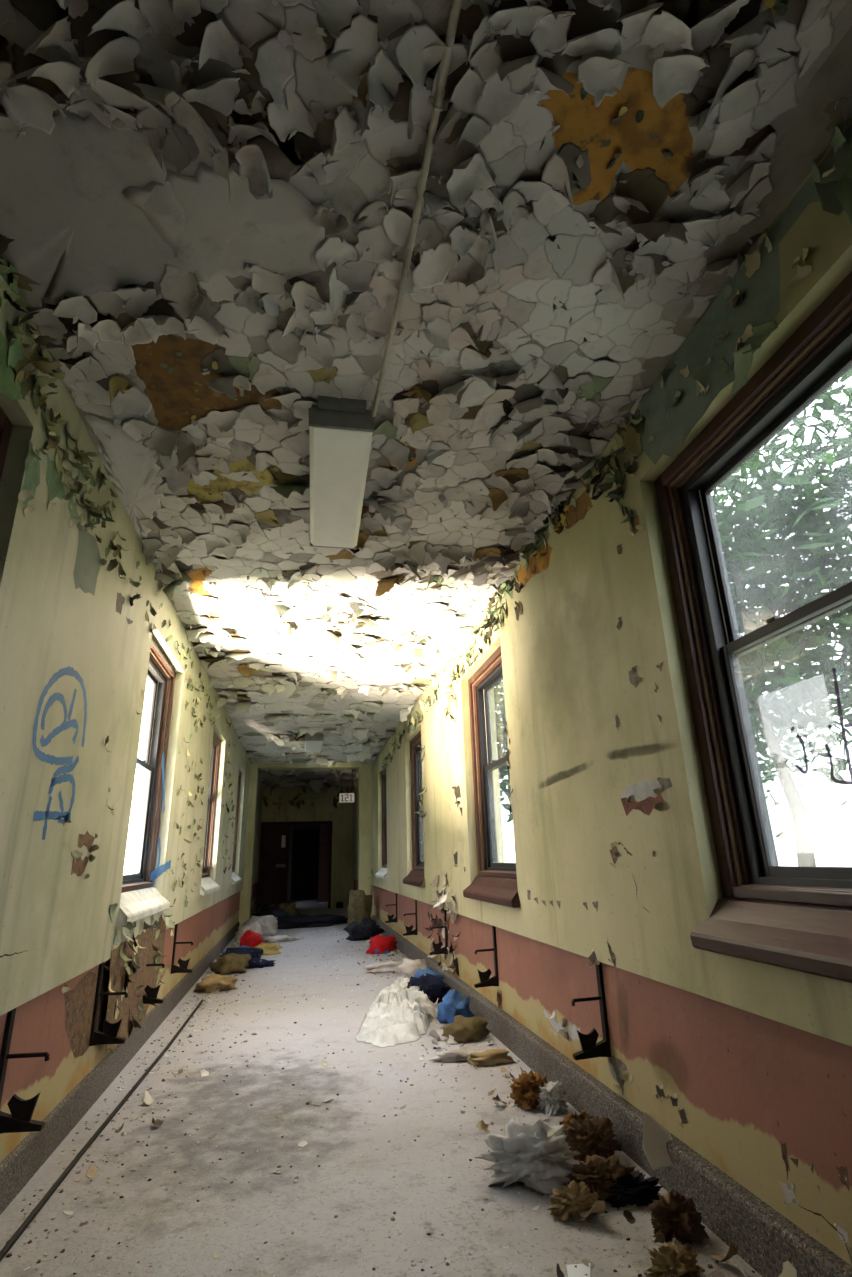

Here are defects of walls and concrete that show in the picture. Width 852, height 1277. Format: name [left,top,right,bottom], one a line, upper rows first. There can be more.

peeling [0,0,852,907]
peeling [424,849,466,977]
spalling [587,938,617,968]
peeling [61,911,175,1063]
spalling [543,1010,580,1040]
spalling [607,1055,633,1095]
spalling [655,1085,688,1127]
spalling [779,1143,814,1208]